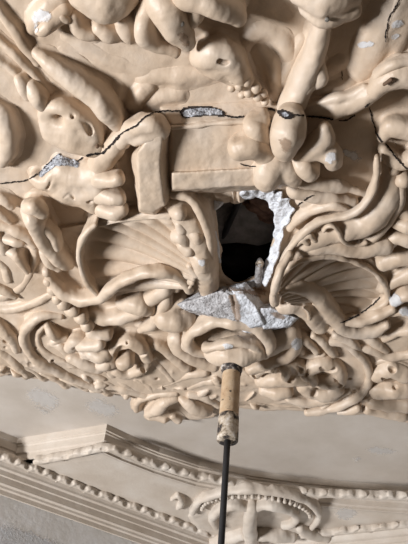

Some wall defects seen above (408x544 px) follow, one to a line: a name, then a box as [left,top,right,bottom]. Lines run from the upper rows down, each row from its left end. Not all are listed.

peeling [32,9,51,32]
crack [385,0,399,42]
spalling [179,106,225,118]
crack [65,110,180,163]
crack [293,103,407,169]
crack [0,174,38,184]
spalling [39,153,79,177]
spalling [239,190,295,287]
spalling [177,276,299,333]
crack [340,297,380,323]